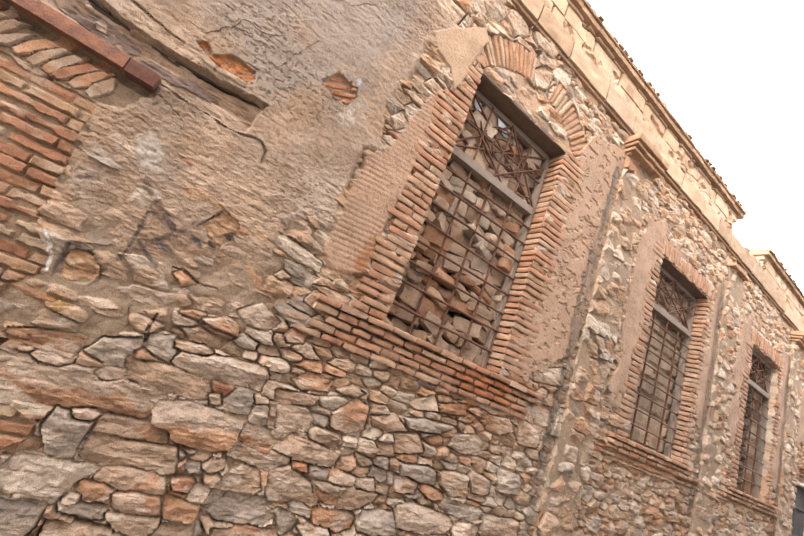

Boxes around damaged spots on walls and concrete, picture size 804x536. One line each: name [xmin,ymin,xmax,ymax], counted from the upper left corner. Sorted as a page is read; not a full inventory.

crack [207,19,283,36]
peeling [55,0,220,105]
spalling [196,40,254,87]
crack [156,85,267,157]
spalling [324,72,368,127]
spalling [204,212,238,249]
spalling [61,250,100,281]